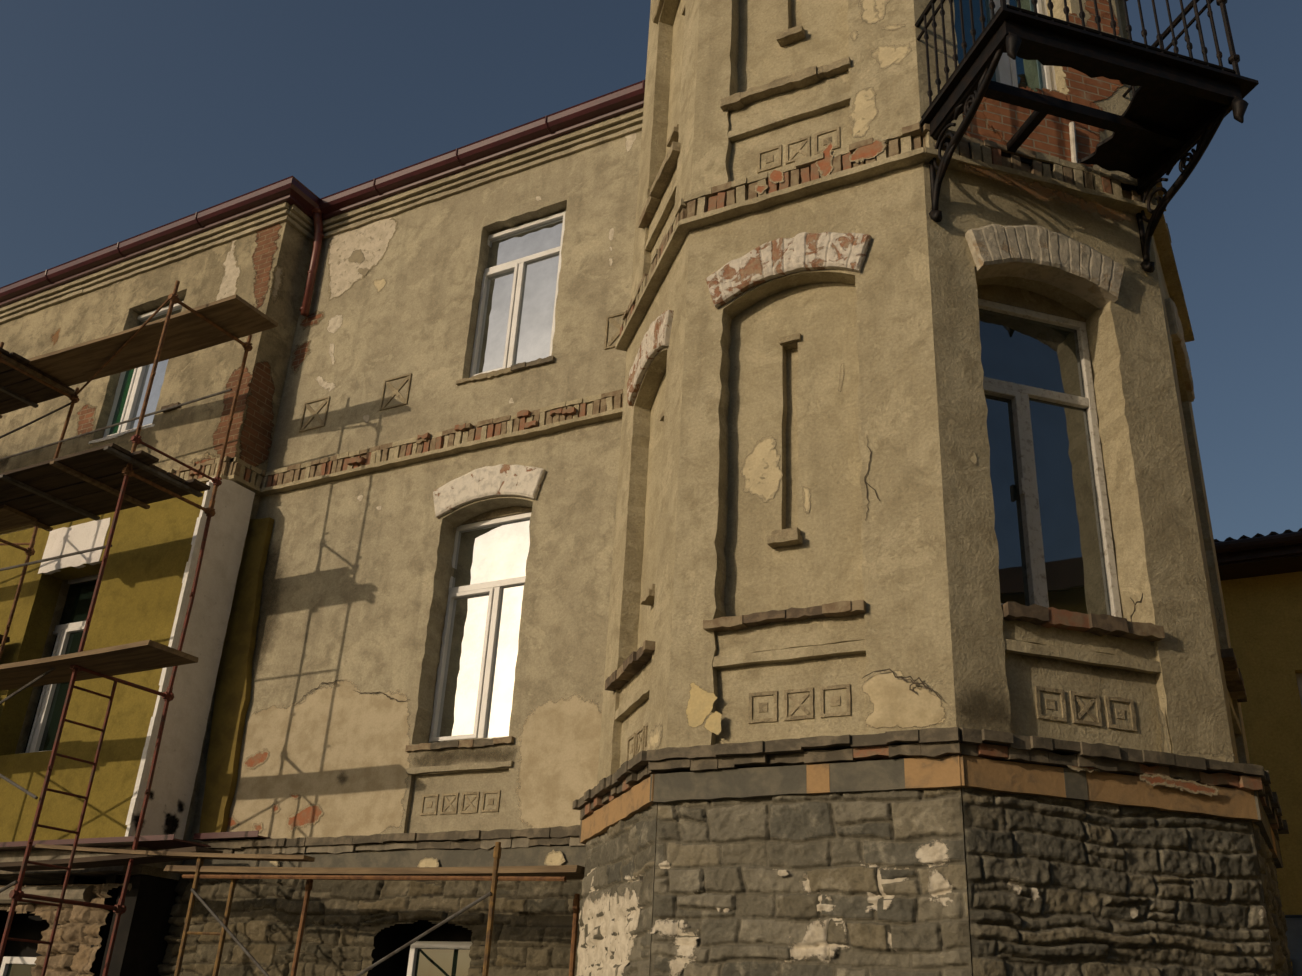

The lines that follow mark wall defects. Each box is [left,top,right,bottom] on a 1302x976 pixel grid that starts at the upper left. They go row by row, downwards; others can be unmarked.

peeling [850,0,912,69]
peeling [849,87,886,163]
peeling [215,239,241,301]
peeling [328,216,398,301]
peeling [327,315,342,365]
peeling [740,436,783,503]
crack [864,439,880,521]
crack [294,680,410,706]
peeling [686,683,722,735]
peeling [576,868,699,976]